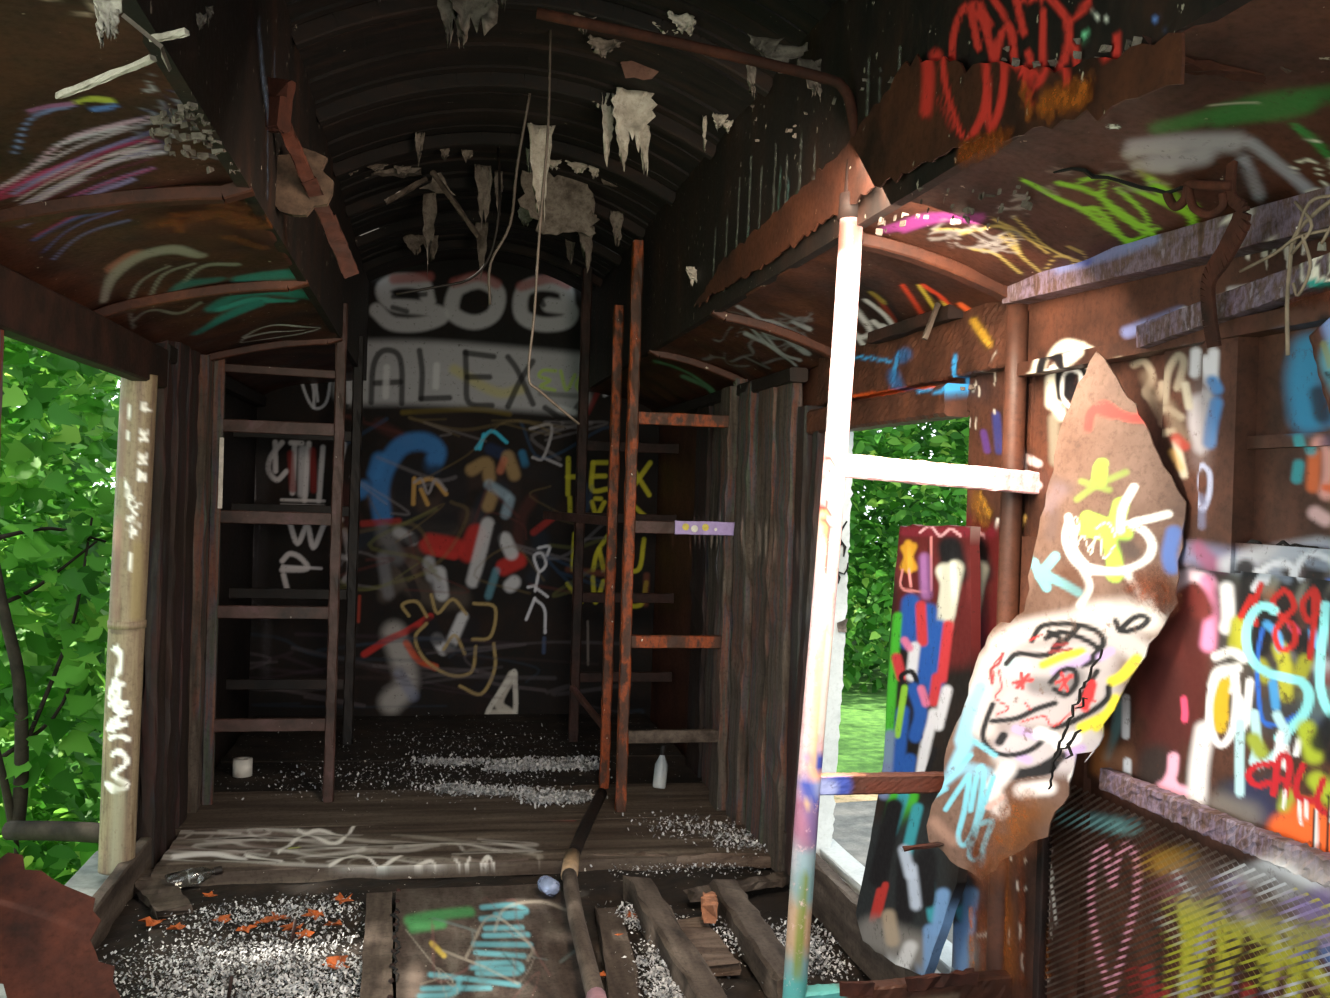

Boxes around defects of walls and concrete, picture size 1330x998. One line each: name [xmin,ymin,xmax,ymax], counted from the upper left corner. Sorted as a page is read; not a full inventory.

peeling [93,0,123,48]
peeling [437,0,506,49]
peeling [573,12,625,58]
peeling [652,11,696,36]
peeling [1073,36,1143,59]
peeling [746,34,837,138]
peeling [349,132,425,176]
peeling [517,87,657,227]
peeling [702,113,733,151]
peeling [403,193,439,278]
peeling [440,148,503,277]
peeling [565,196,624,273]